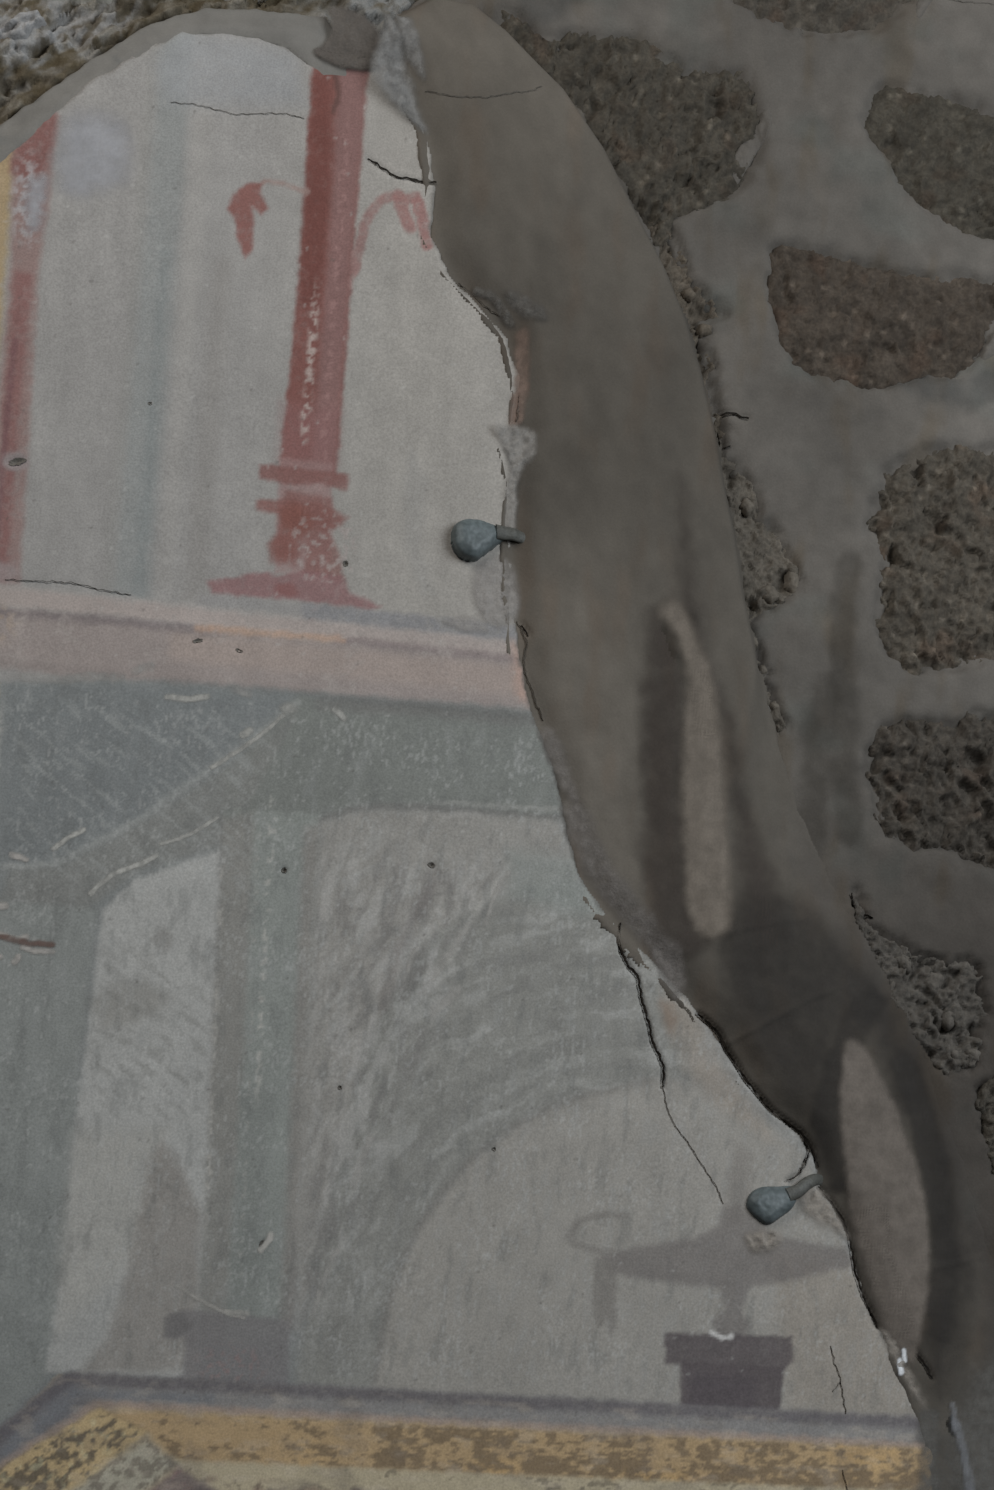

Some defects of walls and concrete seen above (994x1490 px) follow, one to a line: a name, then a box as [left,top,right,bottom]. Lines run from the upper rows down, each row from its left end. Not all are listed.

spalling [0,0,425,129]
crack [171,102,302,118]
crack [367,158,436,184]
spalling [647,222,719,387]
flaking render [496,424,535,528]
crack [5,579,131,595]
flaking render [451,560,517,630]
spalling [712,413,799,732]
spalling [851,899,989,1075]
crack [619,922,724,1204]
spalling [975,1077,994,1174]